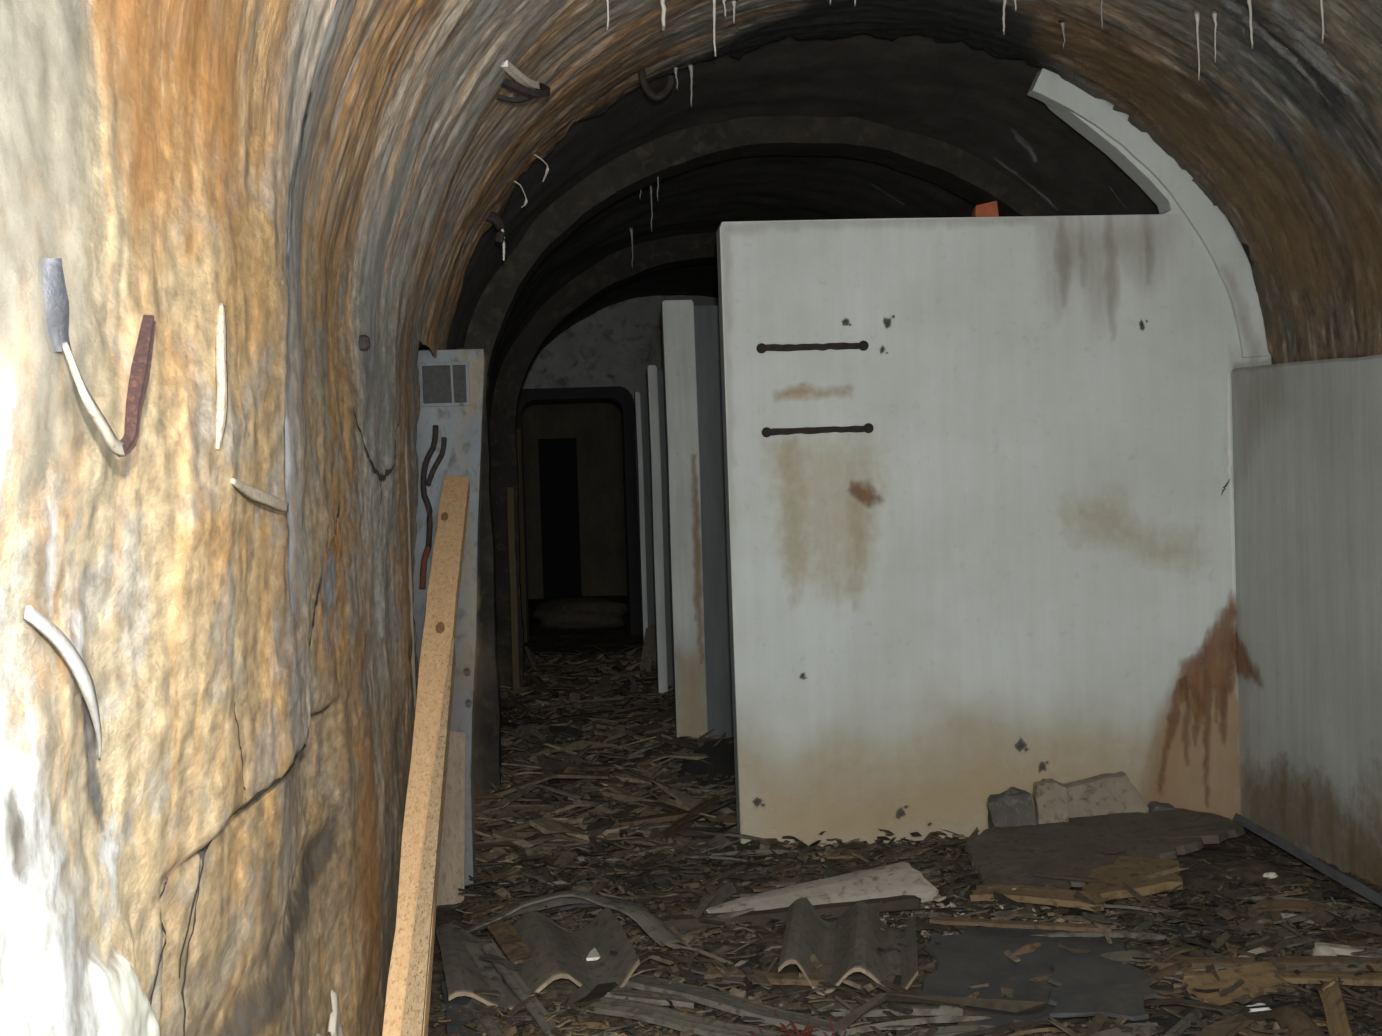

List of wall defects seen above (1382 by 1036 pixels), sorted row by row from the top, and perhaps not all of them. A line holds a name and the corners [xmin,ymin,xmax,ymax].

peeling [47,504,57,587]
corrosion [851,484,880,505]
peeling [0,650,108,1036]
peeling [24,605,117,894]
crack [233,701,332,815]
water stain [762,757,1115,845]
corrosion [1147,601,1257,823]
crack [149,840,212,1036]
flaking render [316,989,345,1036]